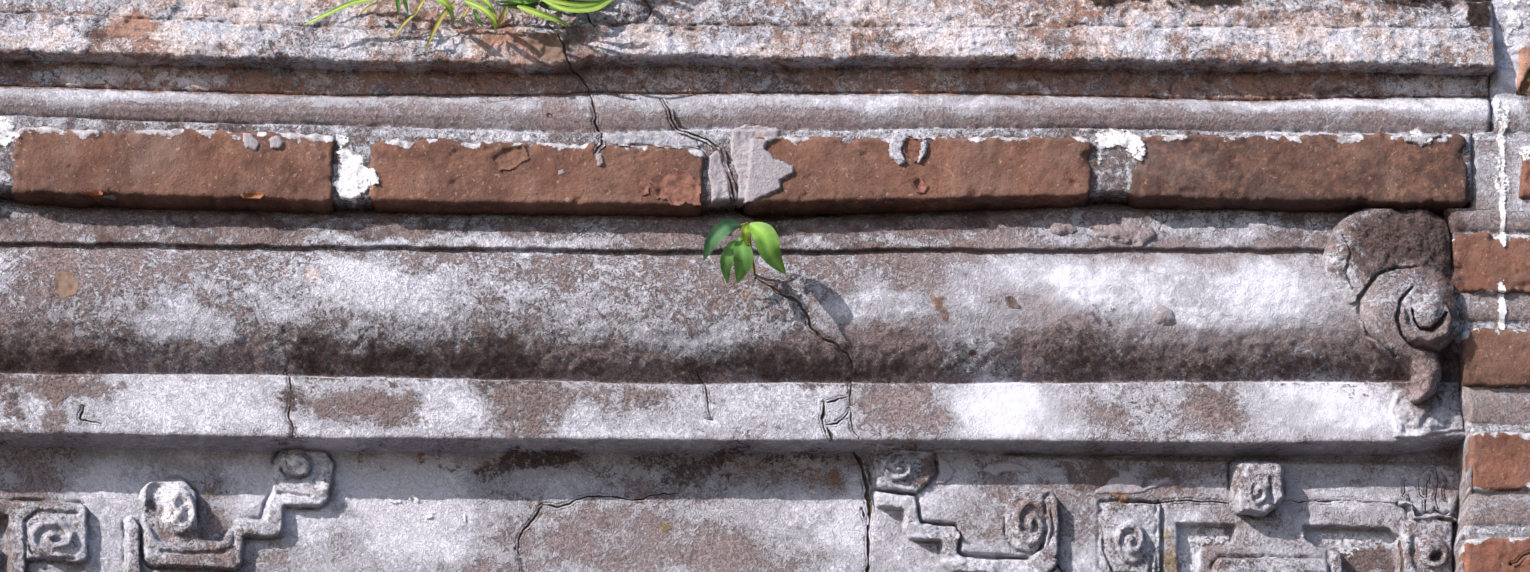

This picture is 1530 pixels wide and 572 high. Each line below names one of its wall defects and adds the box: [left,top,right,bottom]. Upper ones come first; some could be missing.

crack [642,0,654,21]
crack [547,0,605,154]
spalling [1516,69,1530,96]
flaking render [595,124,794,209]
crack [756,277,874,572]
crack [515,491,679,572]